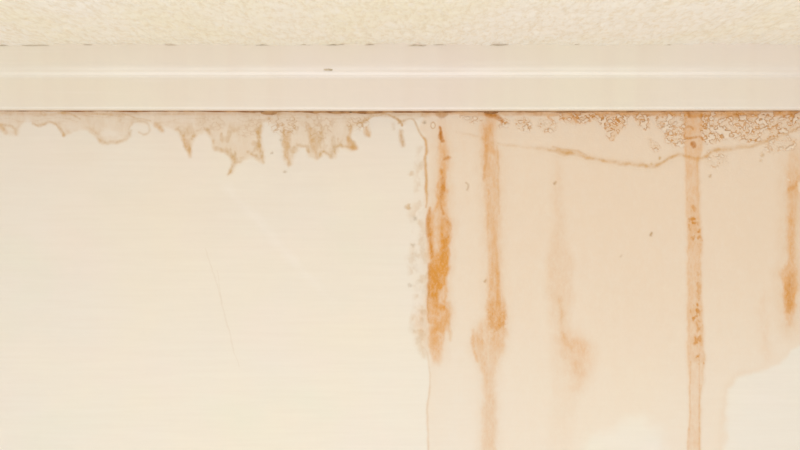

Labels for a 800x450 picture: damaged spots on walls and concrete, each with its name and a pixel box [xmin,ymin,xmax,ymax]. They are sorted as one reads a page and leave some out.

damp [0,111,485,450]
damp [496,117,688,450]
damp [699,127,800,450]